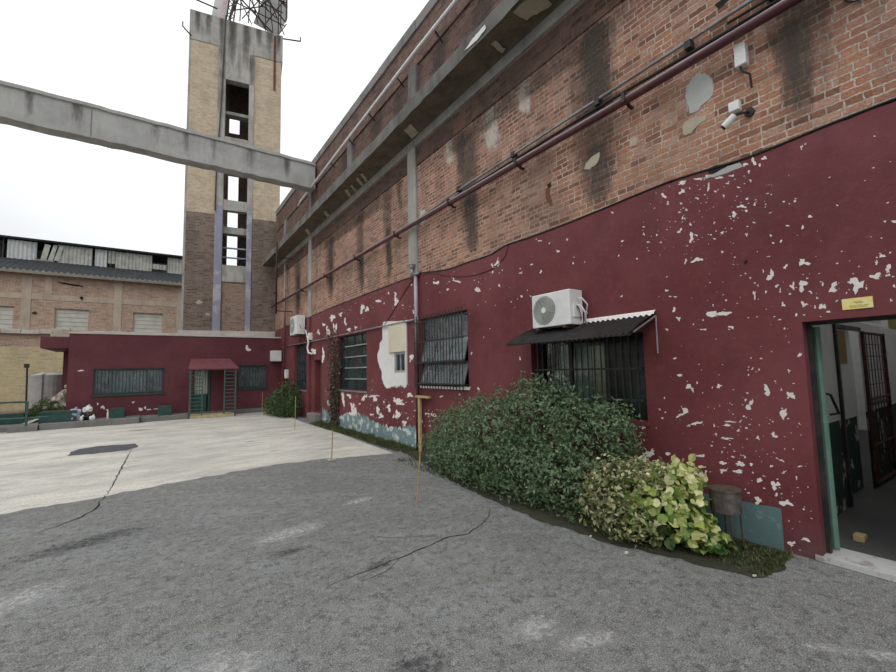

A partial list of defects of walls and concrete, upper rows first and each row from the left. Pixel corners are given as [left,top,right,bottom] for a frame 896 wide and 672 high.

water stain [477,70,545,147]
peeling [643,156,772,264]
peeling [312,291,403,338]
peeling [692,294,741,339]
peeling [721,250,895,317]
peeling [341,389,436,426]